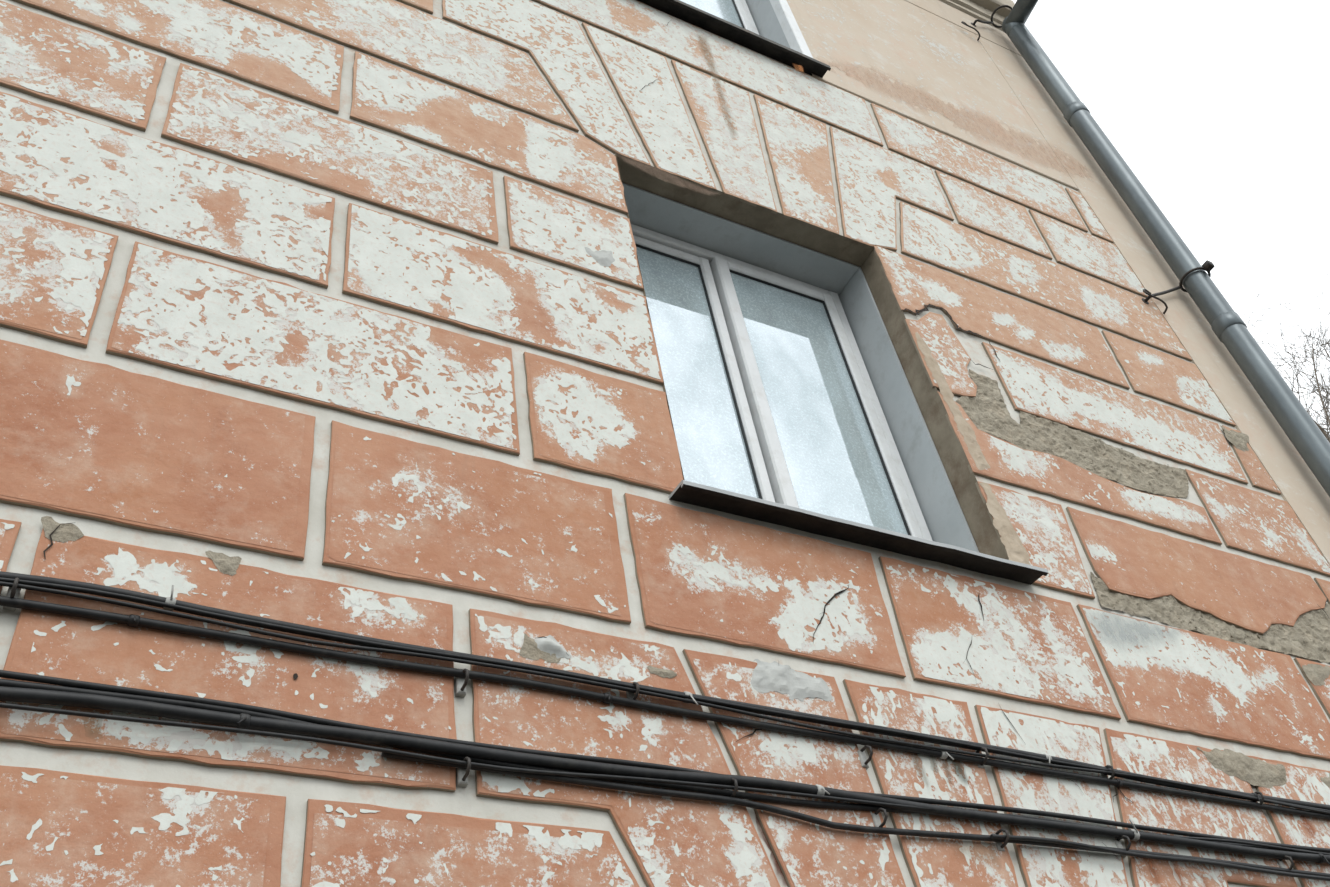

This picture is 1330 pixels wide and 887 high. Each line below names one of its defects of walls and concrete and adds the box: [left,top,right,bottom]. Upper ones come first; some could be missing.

peeling [0,0,1330,573]
crack [904,304,1000,370]
peeling [0,341,451,738]
peeling [328,430,626,616]
crack [813,586,849,642]
peeling [0,772,271,887]
peeling [0,701,450,785]
peeling [310,804,635,887]
peeling [475,614,904,887]
peeling [851,686,1016,887]
peeling [980,707,1330,887]